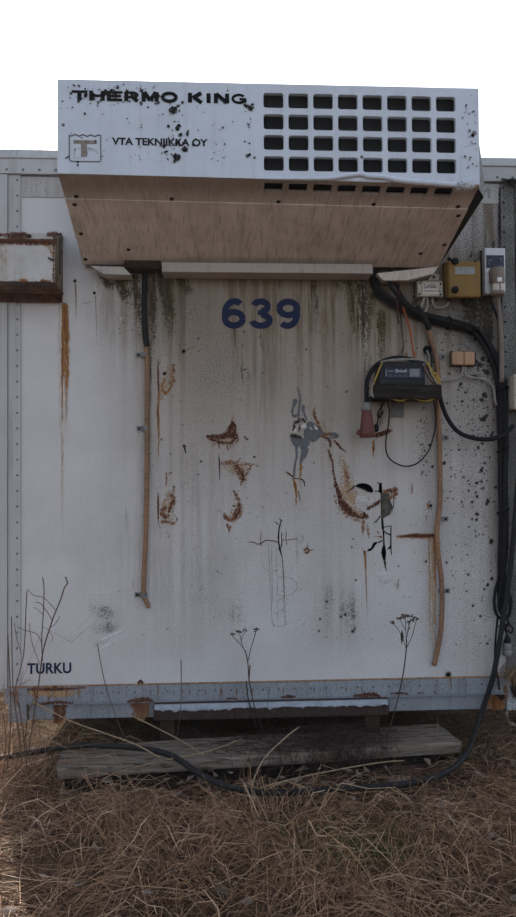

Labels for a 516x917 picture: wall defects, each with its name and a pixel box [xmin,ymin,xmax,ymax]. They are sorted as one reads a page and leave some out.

corrosion [0,231,63,282]
corrosion [61,303,70,409]
corrosion [157,360,176,456]
corrosion [157,472,178,527]
corrosion [206,416,258,532]
corrosion [313,408,398,538]
corrosion [8,686,85,725]
corrosion [127,685,159,722]